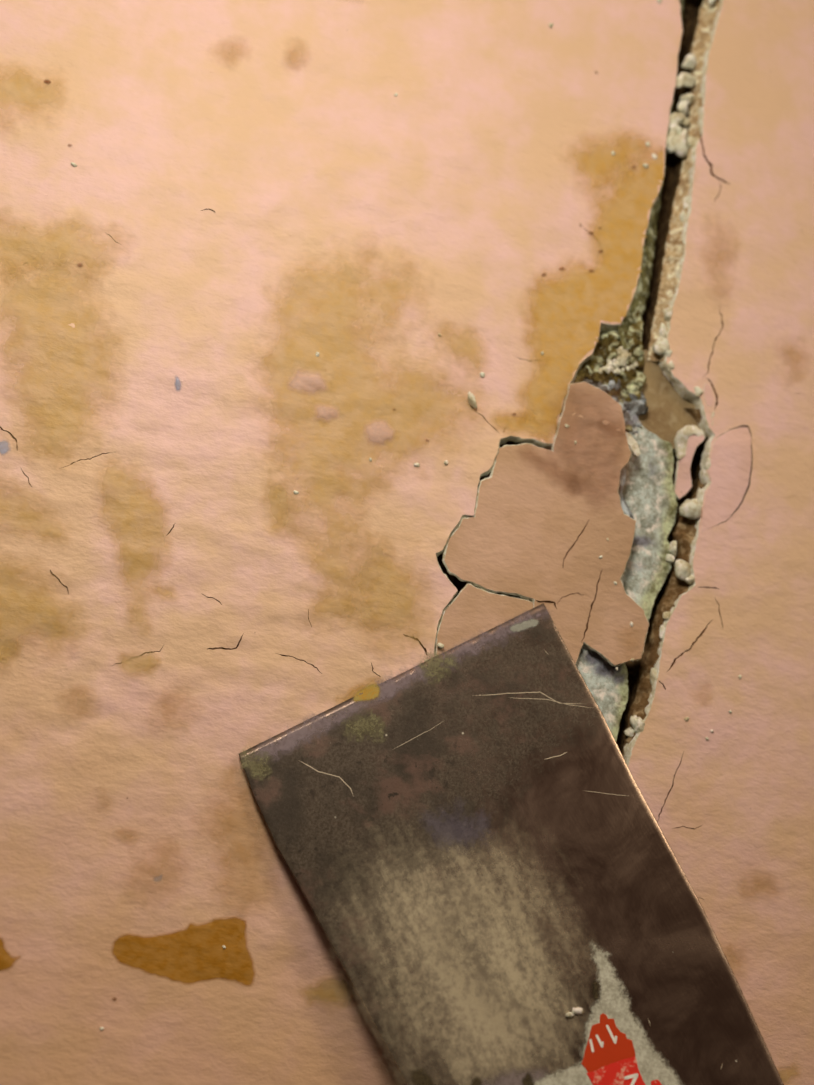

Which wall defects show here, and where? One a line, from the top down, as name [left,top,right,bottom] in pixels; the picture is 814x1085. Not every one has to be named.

leakage [0,224,110,454]
leakage [104,468,163,582]
leakage [266,267,454,627]
crack [403,530,532,655]
crack [472,409,551,450]
leakage [496,137,664,433]
peeling [434,275,752,766]
crack [616,306,723,759]
crack [617,0,729,373]
spalling [666,0,723,338]
leakage [0,939,18,970]
leakage [113,917,254,985]